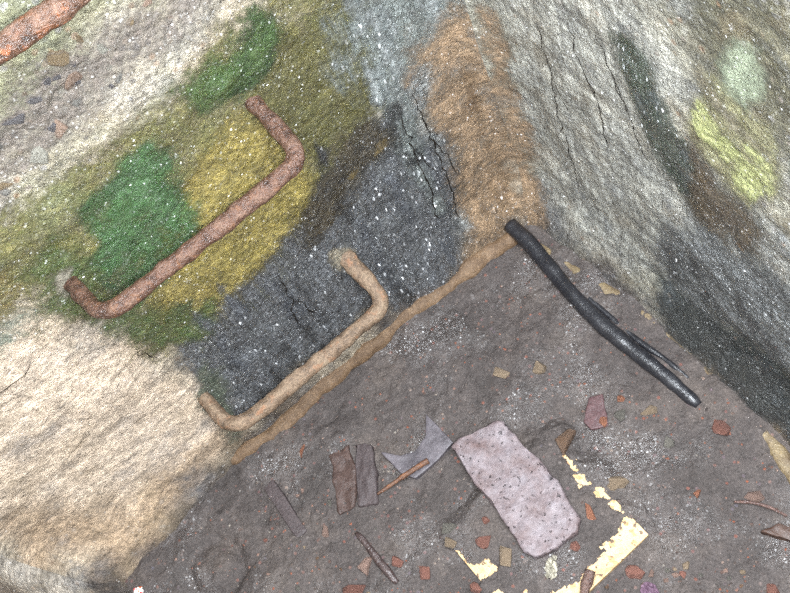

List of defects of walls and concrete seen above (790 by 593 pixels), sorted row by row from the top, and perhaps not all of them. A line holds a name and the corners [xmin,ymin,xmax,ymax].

leakage [656,43,790,436]